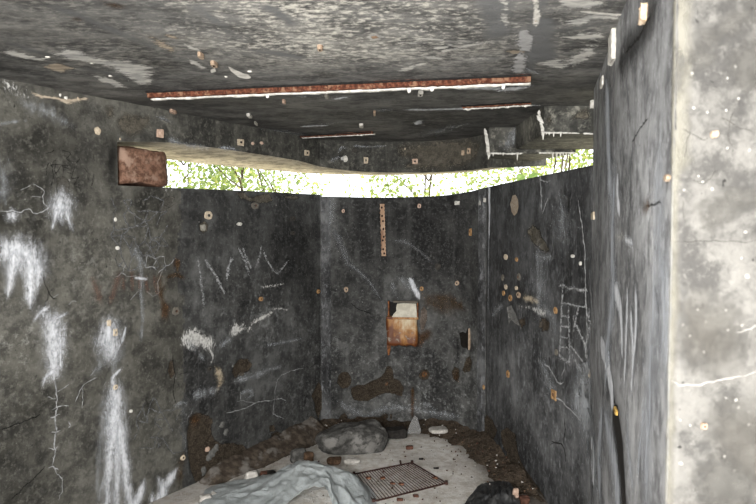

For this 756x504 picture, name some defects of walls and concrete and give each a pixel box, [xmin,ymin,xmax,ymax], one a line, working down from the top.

crack [672,371,756,386]